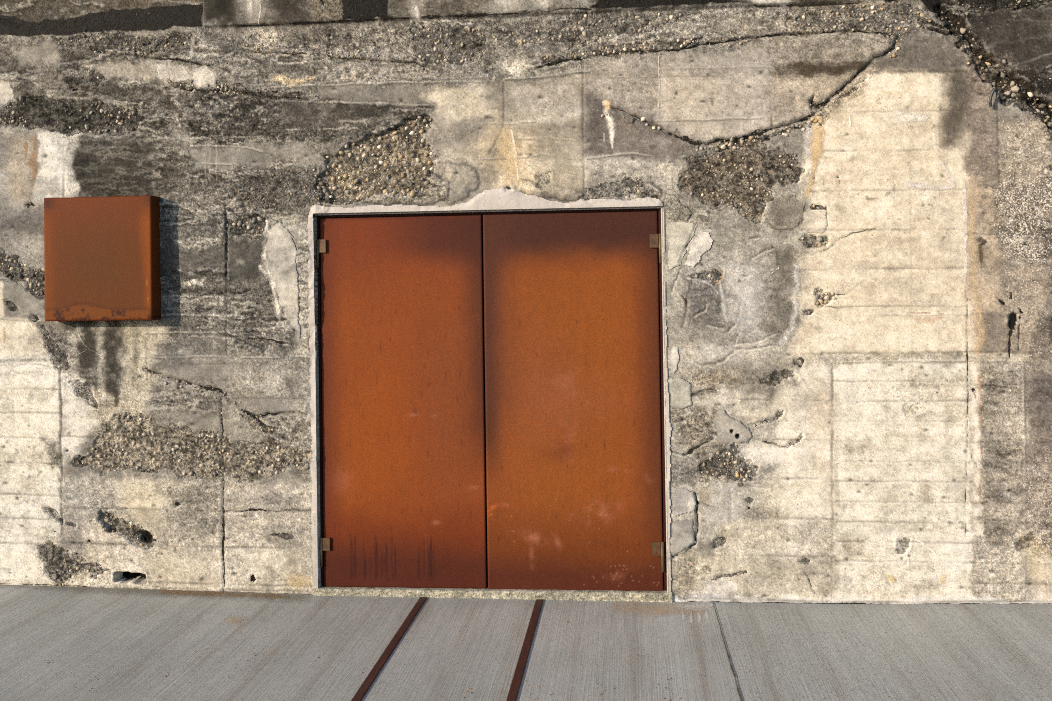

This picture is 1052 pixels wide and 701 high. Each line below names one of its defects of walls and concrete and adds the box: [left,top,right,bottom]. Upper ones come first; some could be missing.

crack [536,0,1046,157]
leakage [946,69,965,144]
spalling [226,114,436,236]
spalling [678,114,820,224]
leakage [65,321,122,406]
spalling [65,412,318,484]
crack [144,367,307,442]
crack [212,473,291,593]